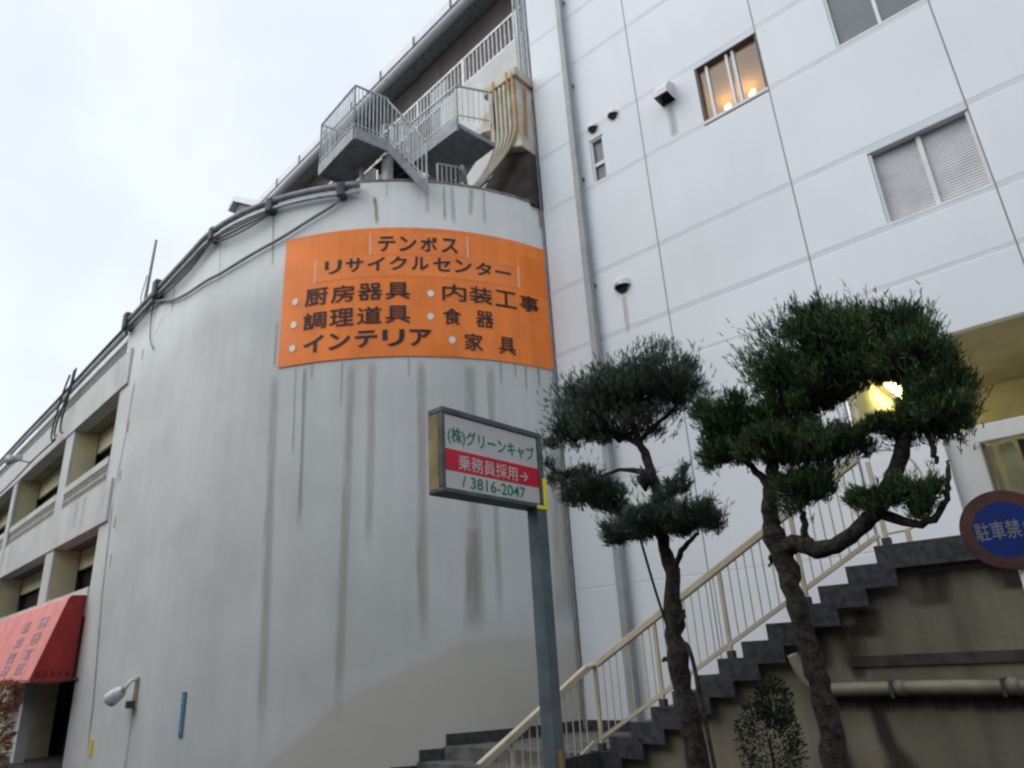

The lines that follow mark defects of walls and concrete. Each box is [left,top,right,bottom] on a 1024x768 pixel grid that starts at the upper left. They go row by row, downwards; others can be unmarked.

corrosion [492,72,527,134]